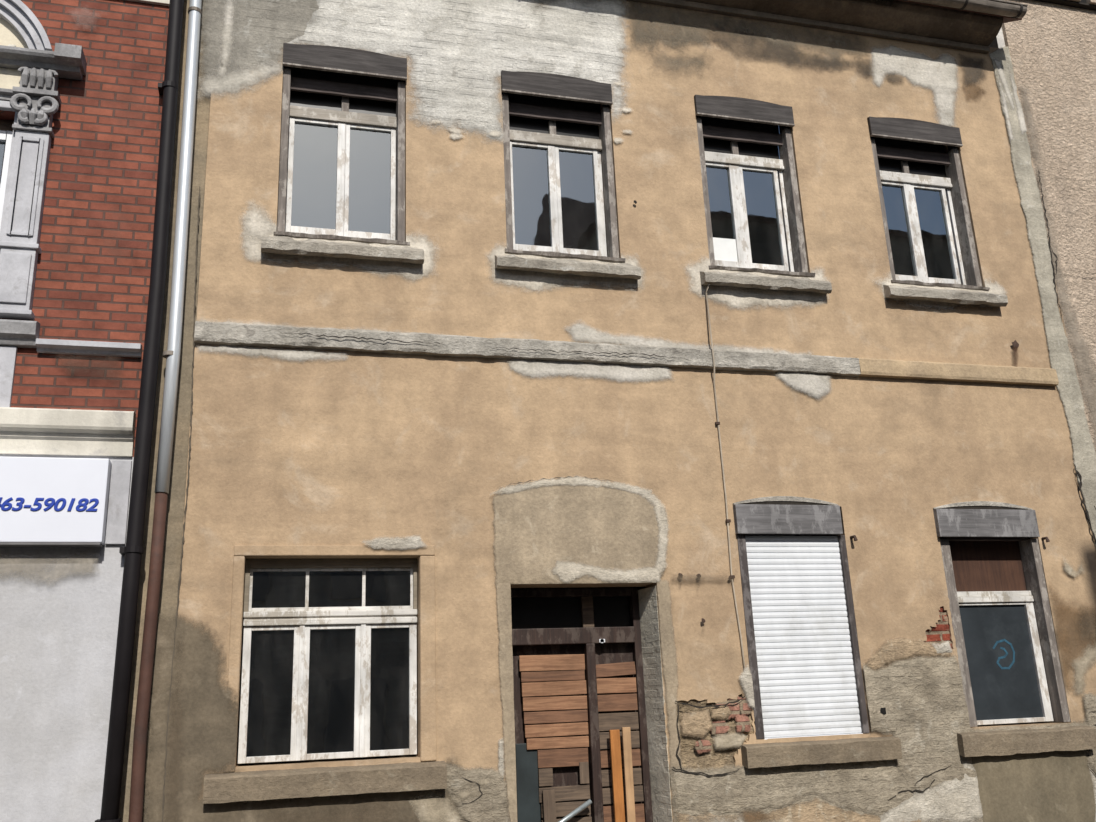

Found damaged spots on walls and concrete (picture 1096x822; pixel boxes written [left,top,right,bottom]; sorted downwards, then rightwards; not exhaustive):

damp [629,1,873,77]
peeling [432,121,463,139]
crack [1075,466,1096,541]
damp [143,614,457,822]
flaking render [670,606,1089,822]
flaking render [446,764,510,822]
crack [888,765,951,801]